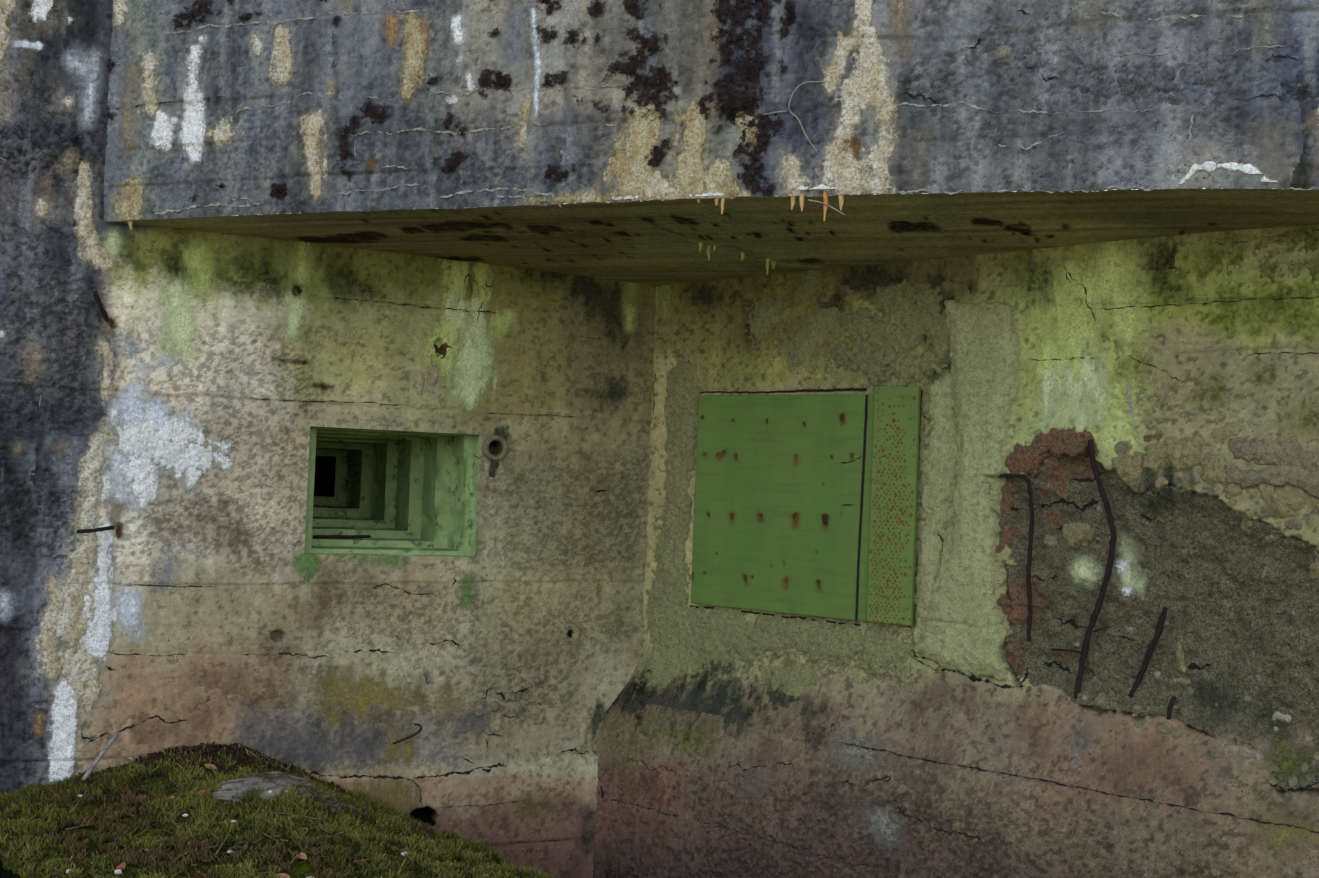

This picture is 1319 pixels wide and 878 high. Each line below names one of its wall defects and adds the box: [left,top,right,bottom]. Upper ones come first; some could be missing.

water stain [31,0,53,22]
water stain [296,0,361,199]
water stain [522,0,762,240]
corrosion [846,137,860,160]
water stain [1178,83,1319,190]
water stain [15,339,232,784]
crack [241,631,467,659]
crack [373,578,456,595]
spalling [995,422,1319,792]
crack [311,666,536,808]
crack [730,762,798,774]
crack [832,742,1319,844]